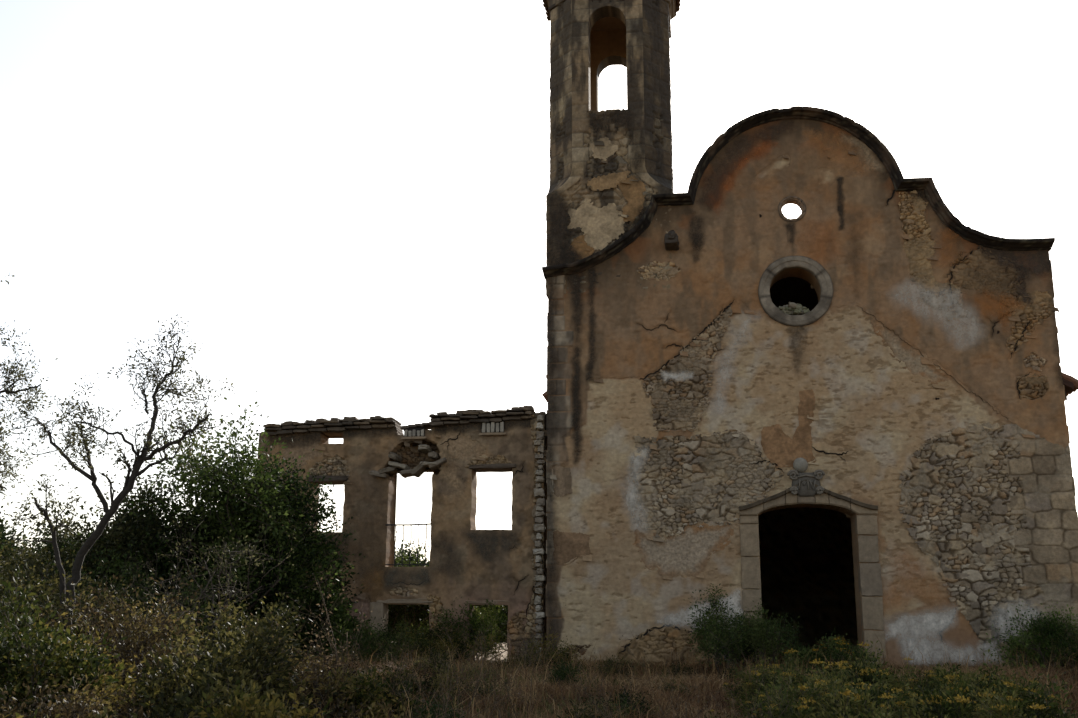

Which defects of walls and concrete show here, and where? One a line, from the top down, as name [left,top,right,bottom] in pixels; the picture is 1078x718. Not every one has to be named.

peeling [567,137,647,260]
flaking render [898,190,1060,401]
peeling [393,426,515,475]
peeling [507,299,1078,669]
damp [889,603,1036,665]